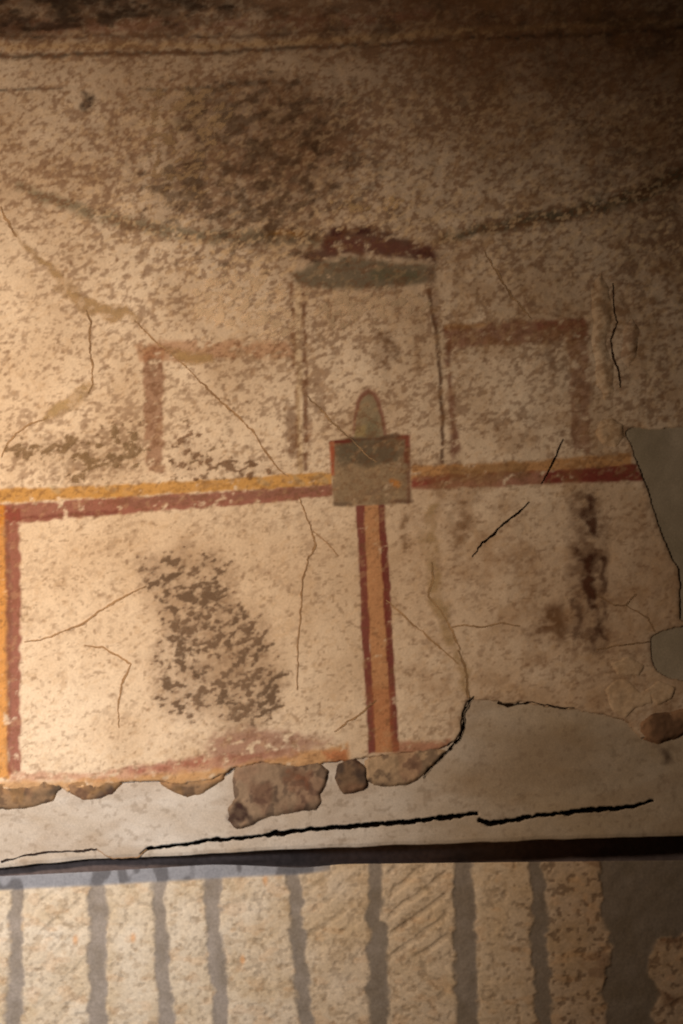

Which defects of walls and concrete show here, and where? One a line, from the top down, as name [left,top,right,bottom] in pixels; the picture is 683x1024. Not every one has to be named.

crack [610,283,621,388]
crack [471,439,563,557]
leakage [582,496,596,535]
leakage [581,553,606,608]
leakage [136,546,287,725]
spalling [640,709,683,744]
spalling [0,781,123,810]
spalling [159,749,446,829]
crack [1,800,653,863]